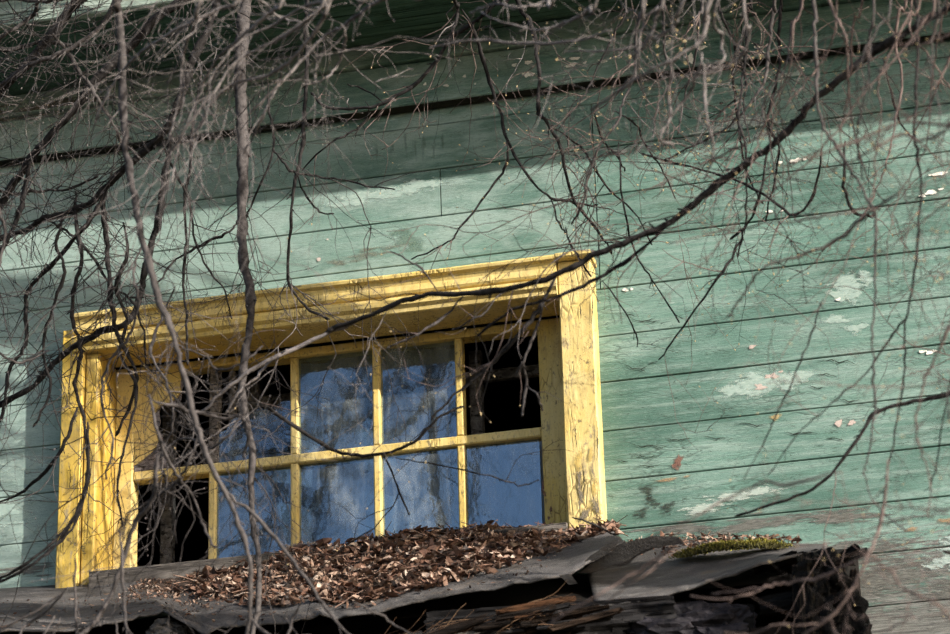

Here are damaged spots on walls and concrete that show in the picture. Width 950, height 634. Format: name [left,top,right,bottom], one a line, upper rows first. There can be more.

peeling [826,271,873,304]
peeling [824,315,869,334]
peeling [716,370,814,399]
peeling [574,448,600,523]
peeling [623,487,891,538]
peeling [829,536,950,599]